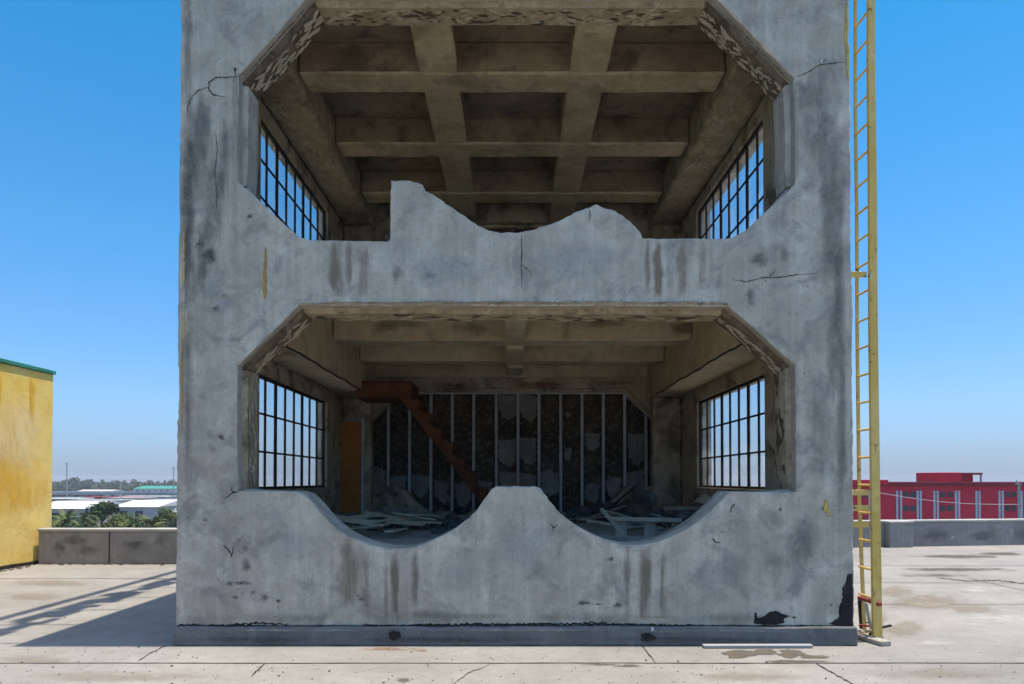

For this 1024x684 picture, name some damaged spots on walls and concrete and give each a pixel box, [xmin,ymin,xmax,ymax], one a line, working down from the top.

crack [187,4,310,117]
peeling [251,8,683,92]
peeling [699,11,782,101]
crack [711,2,840,77]
damp [330,246,350,288]
damp [646,245,685,293]
crack [732,271,817,283]
damp [641,559,663,609]
spalling [753,611,796,625]
spalling [829,573,854,626]